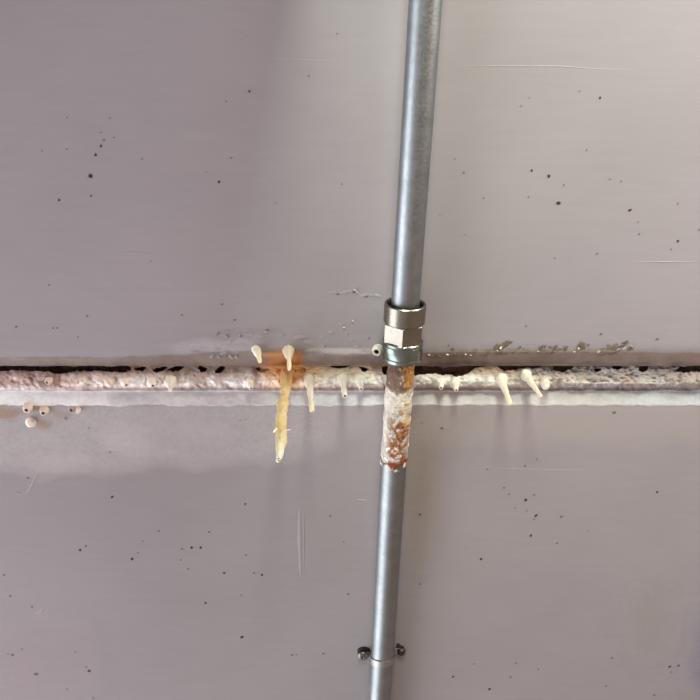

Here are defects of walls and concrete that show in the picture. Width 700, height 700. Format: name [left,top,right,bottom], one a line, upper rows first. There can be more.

leakage [0,342,388,469]
corrosion [263,352,304,385]
corrosion [380,364,415,472]
peeling [426,340,633,358]
leakage [412,350,700,406]